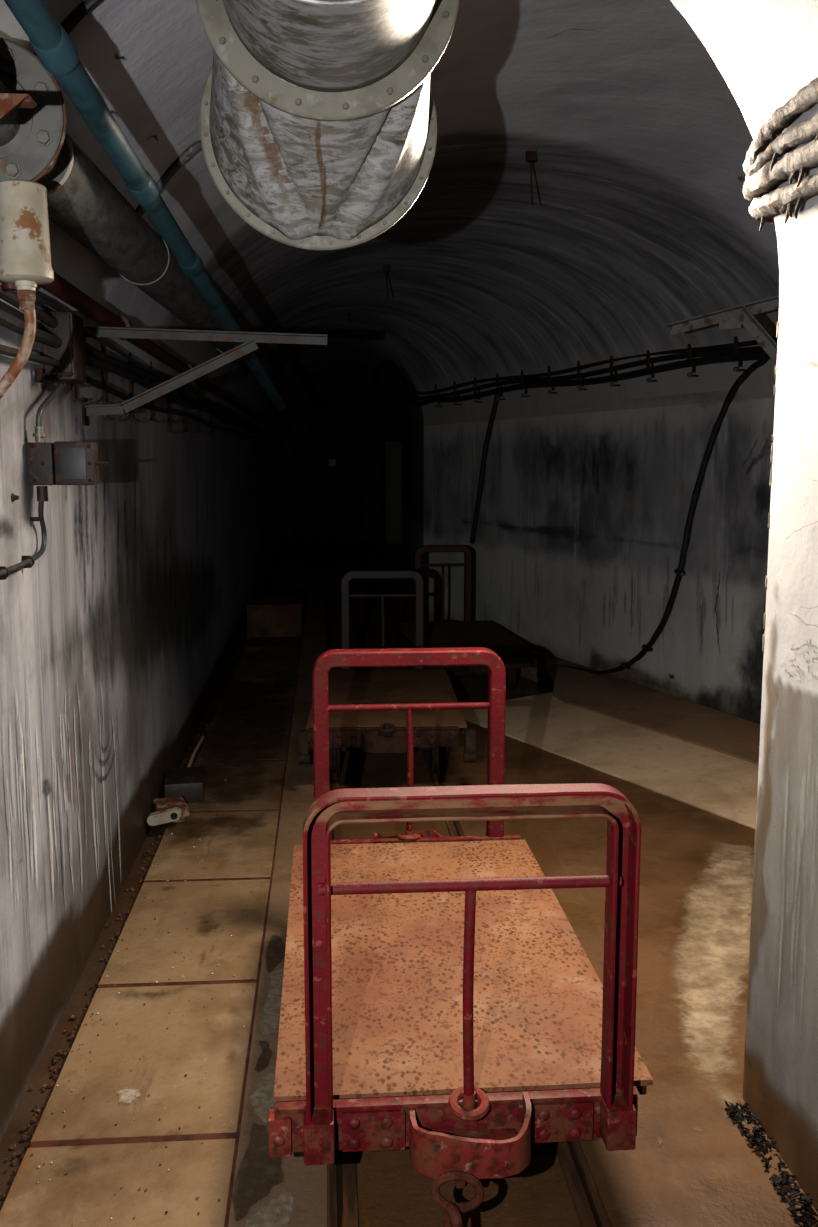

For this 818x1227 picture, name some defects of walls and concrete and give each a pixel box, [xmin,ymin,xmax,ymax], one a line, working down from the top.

damp [757,488,771,508]
damp [66,485,221,679]
damp [0,612,286,1124]
spalling [259,969,284,1035]
spalling [251,1071,276,1123]